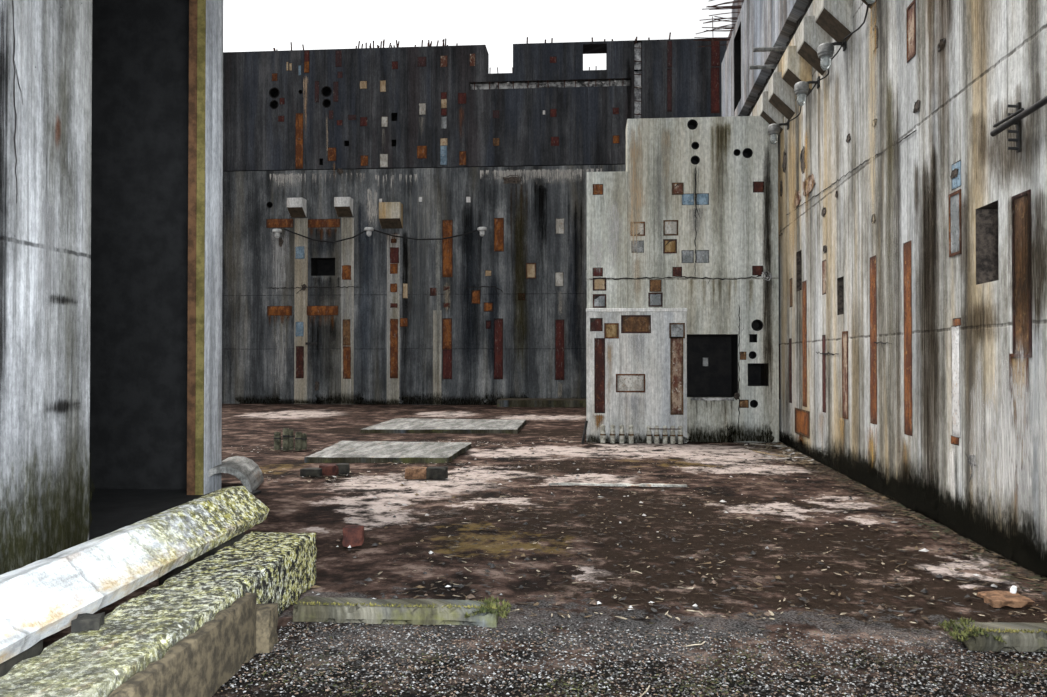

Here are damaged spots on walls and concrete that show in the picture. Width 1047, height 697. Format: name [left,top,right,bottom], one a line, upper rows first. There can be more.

leakage [480,169,602,229]
leakage [559,205,582,354]
leakage [584,128,1047,578]